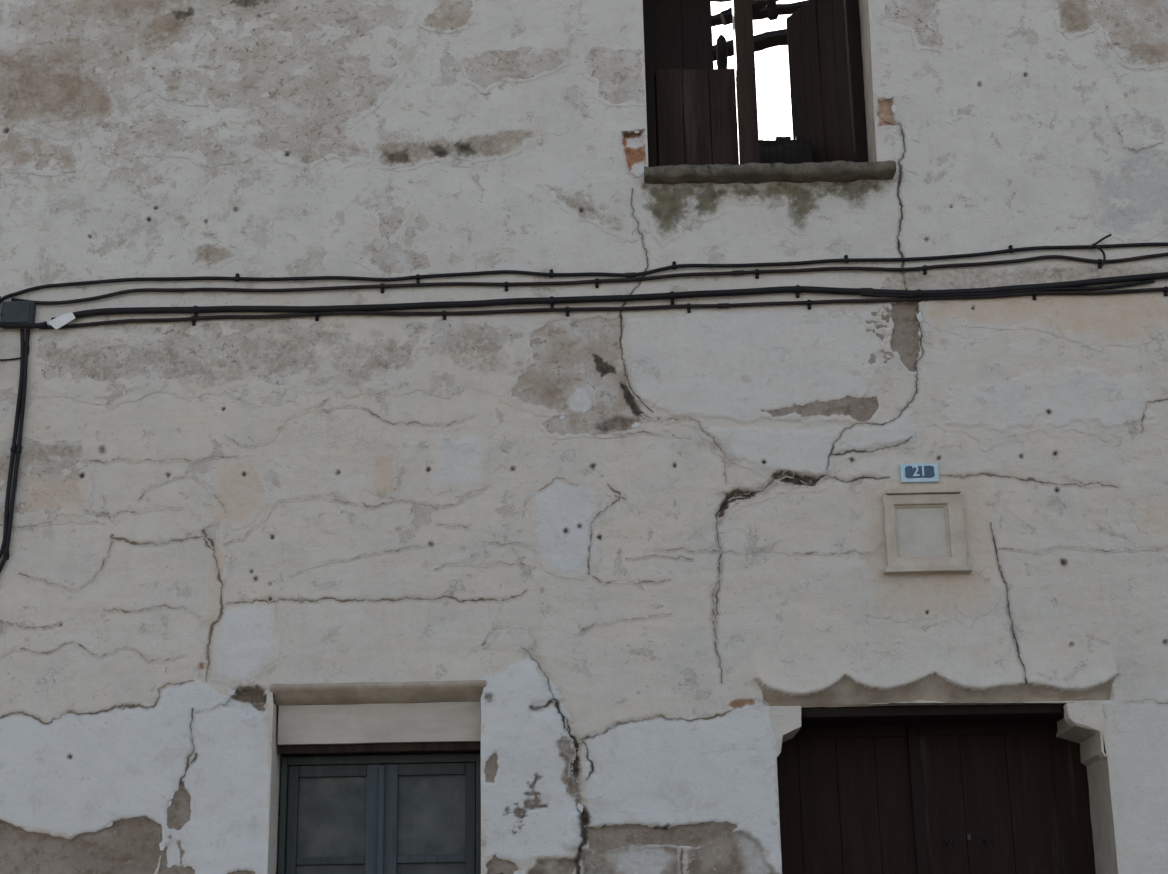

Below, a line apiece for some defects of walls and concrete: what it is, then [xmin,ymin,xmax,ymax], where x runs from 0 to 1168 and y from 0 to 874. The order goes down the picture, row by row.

flaking render [90,0,478,177]
flaking render [351,198,435,282]
flaking render [618,124,648,177]
leakage [781,183,817,235]
leakage [835,179,877,214]
flaking render [499,311,649,439]
flaking render [756,297,925,427]
crack [1139,397,1168,434]
crack [0,120,925,874]
crack [989,522,1168,702]
flaking render [0,778,198,874]
flaking render [481,757,782,874]